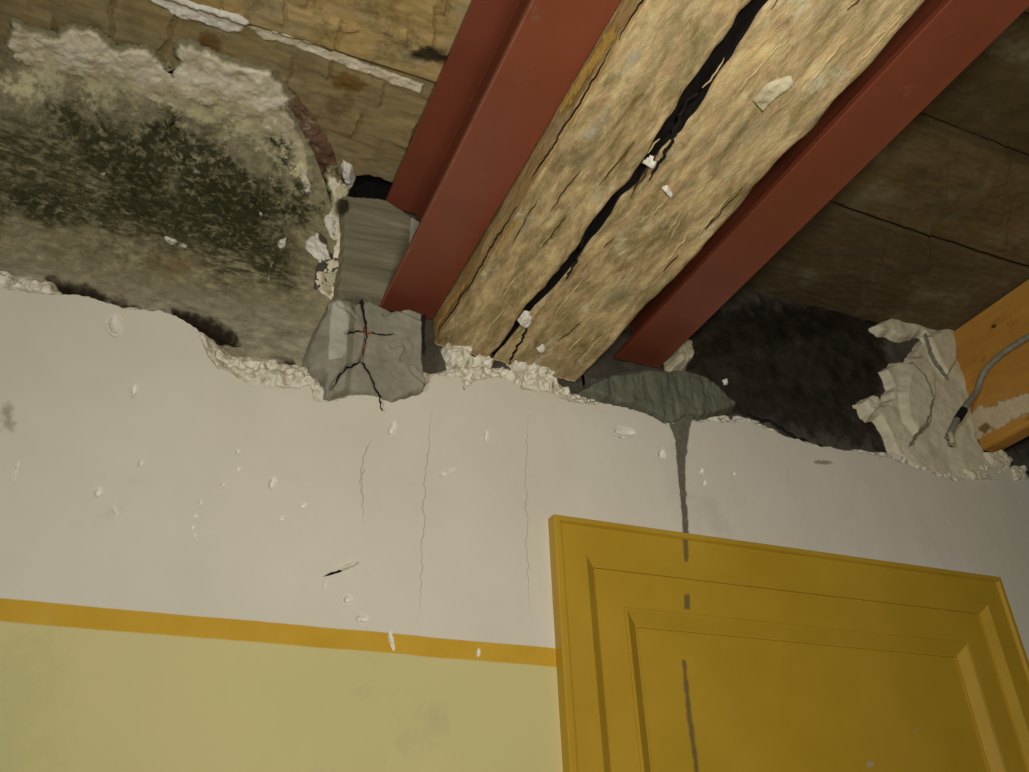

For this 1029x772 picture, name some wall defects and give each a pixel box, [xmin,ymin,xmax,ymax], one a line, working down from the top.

water stain [0,101,310,287]
spalling [0,17,355,402]
crack [331,299,394,411]
crack [420,314,428,356]
spalling [399,317,664,405]
spalling [714,287,812,339]
spalling [873,337,919,366]
spalling [693,370,1029,482]